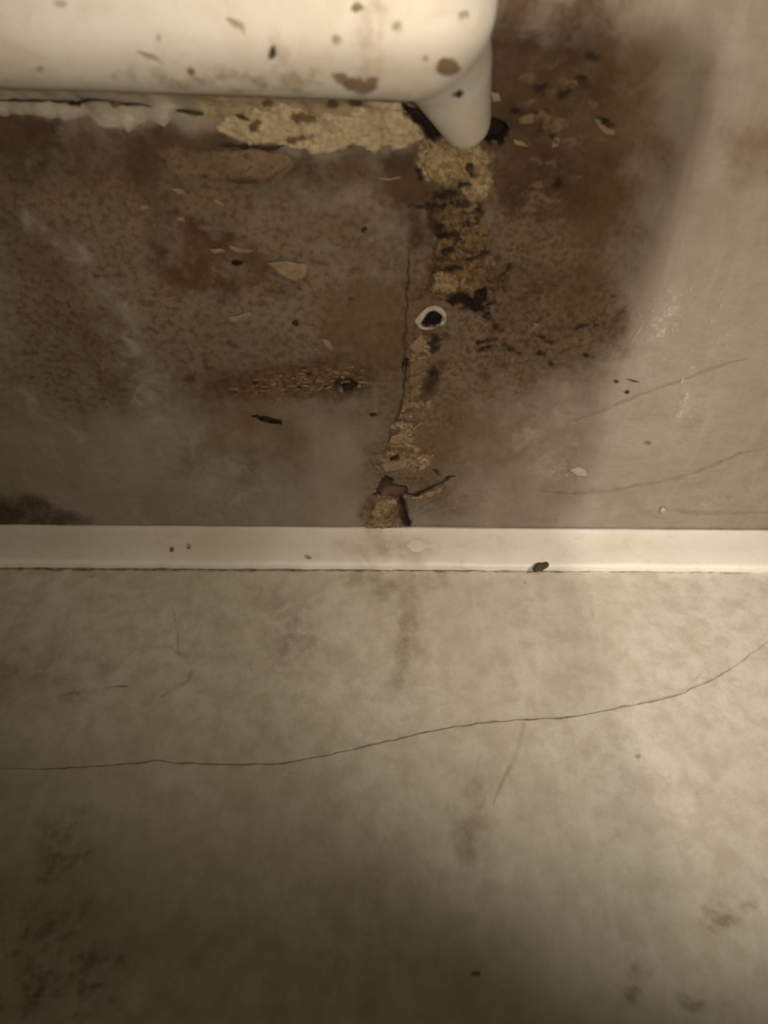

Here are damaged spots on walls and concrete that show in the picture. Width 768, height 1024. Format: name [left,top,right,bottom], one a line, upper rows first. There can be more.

leakage [0,498,76,525]
leakage [0,0,640,516]
spalling [156,94,512,298]
crack [384,249,410,456]
spalling [361,325,449,529]
crack [0,760,252,770]
crack [280,642,768,764]